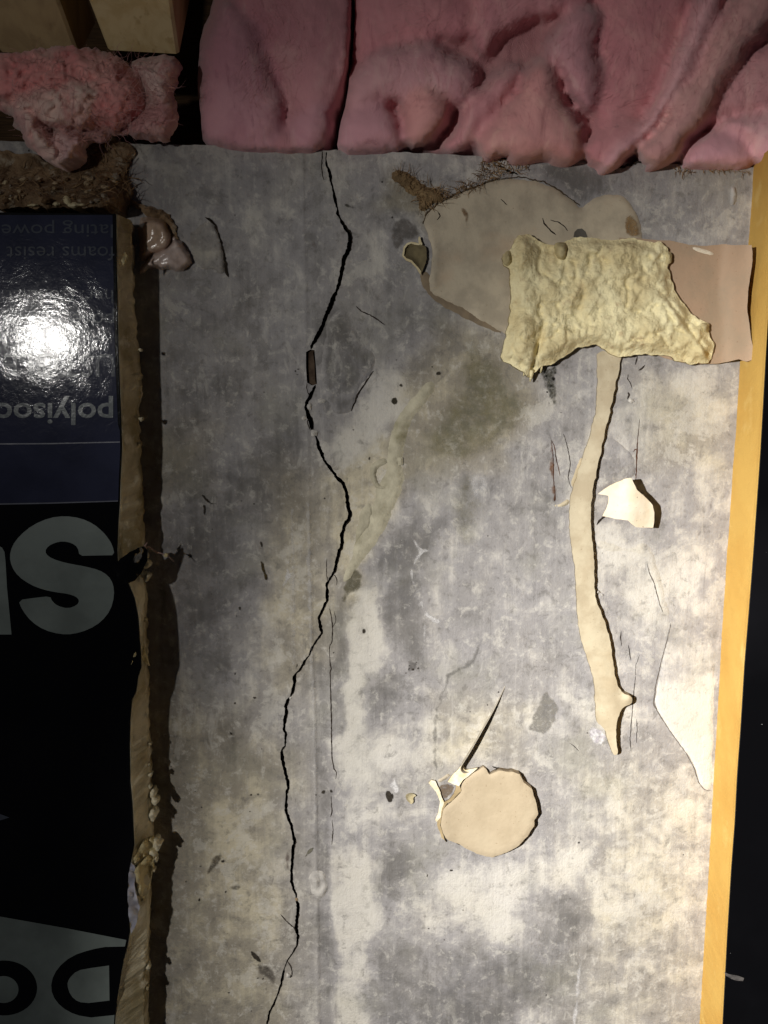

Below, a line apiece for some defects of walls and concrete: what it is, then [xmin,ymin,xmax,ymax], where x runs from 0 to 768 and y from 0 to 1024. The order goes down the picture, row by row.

peeling [393,221,427,275]
mould [538,366,556,403]
peeling [596,438,654,528]
crack [266,152,353,1024]
peeling [597,541,715,791]